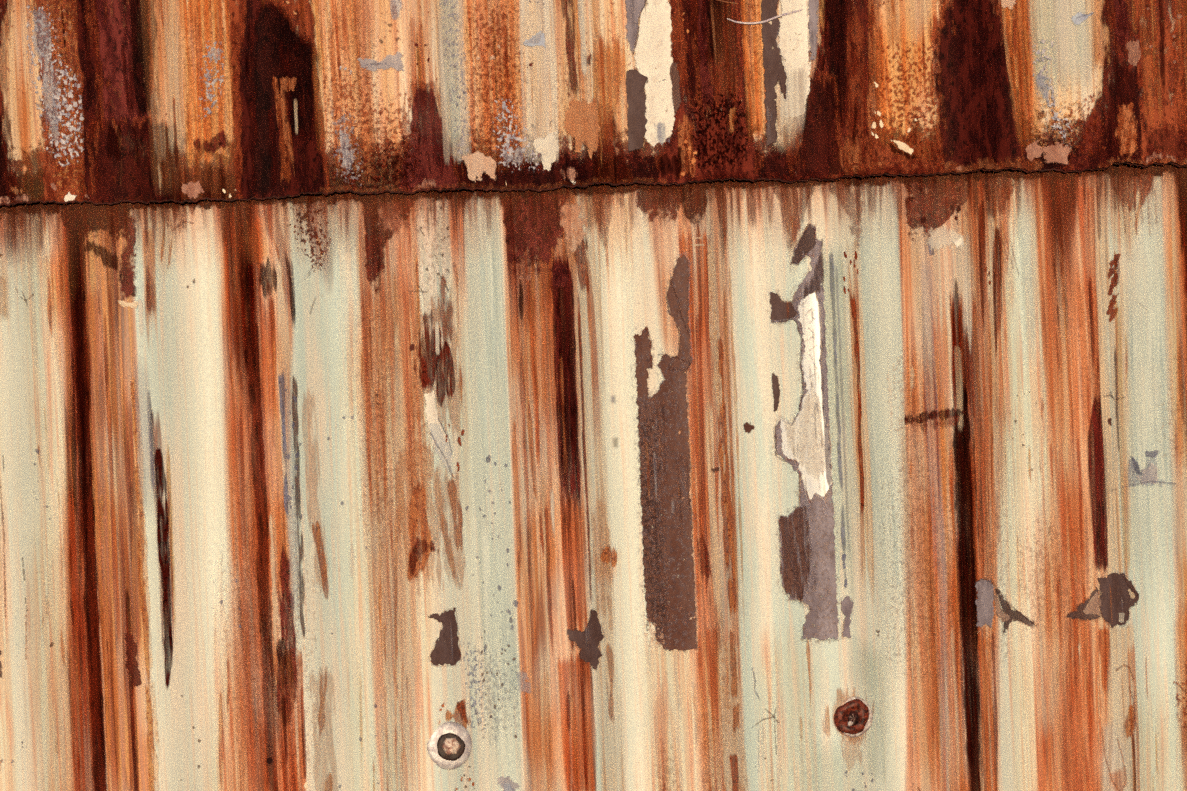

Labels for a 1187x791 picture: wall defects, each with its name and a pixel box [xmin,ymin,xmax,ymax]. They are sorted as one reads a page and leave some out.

peeling [625,0,681,151]
peeling [761,0,819,146]
rust [0,0,1187,618]
rust [125,633,142,687]
rust [155,449,173,686]
rust [277,548,297,722]
peeling [428,607,495,729]
peeling [634,255,698,651]
peeling [770,223,853,640]
rust [952,275,980,784]
peeling [1067,573,1139,628]
rust [1098,626,1133,791]